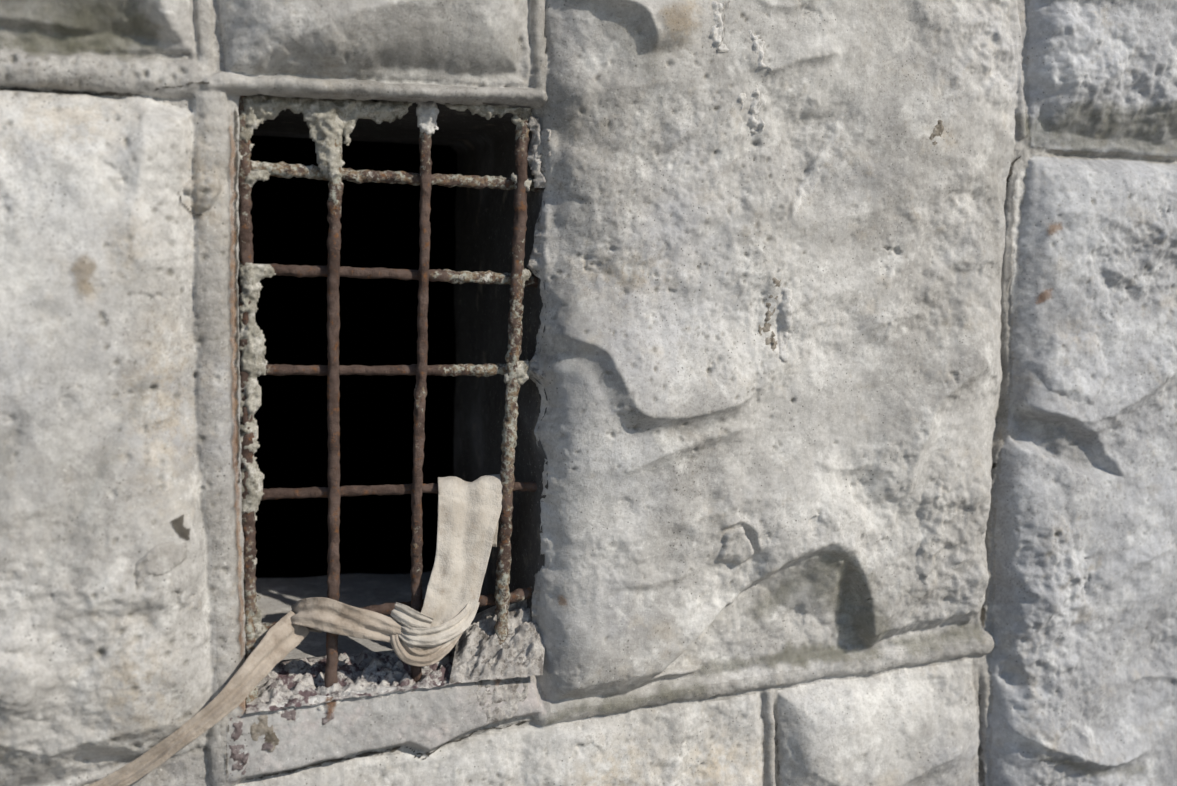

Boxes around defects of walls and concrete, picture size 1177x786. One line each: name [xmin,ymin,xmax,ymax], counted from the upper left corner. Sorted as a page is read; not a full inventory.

rust [230,126,244,653]